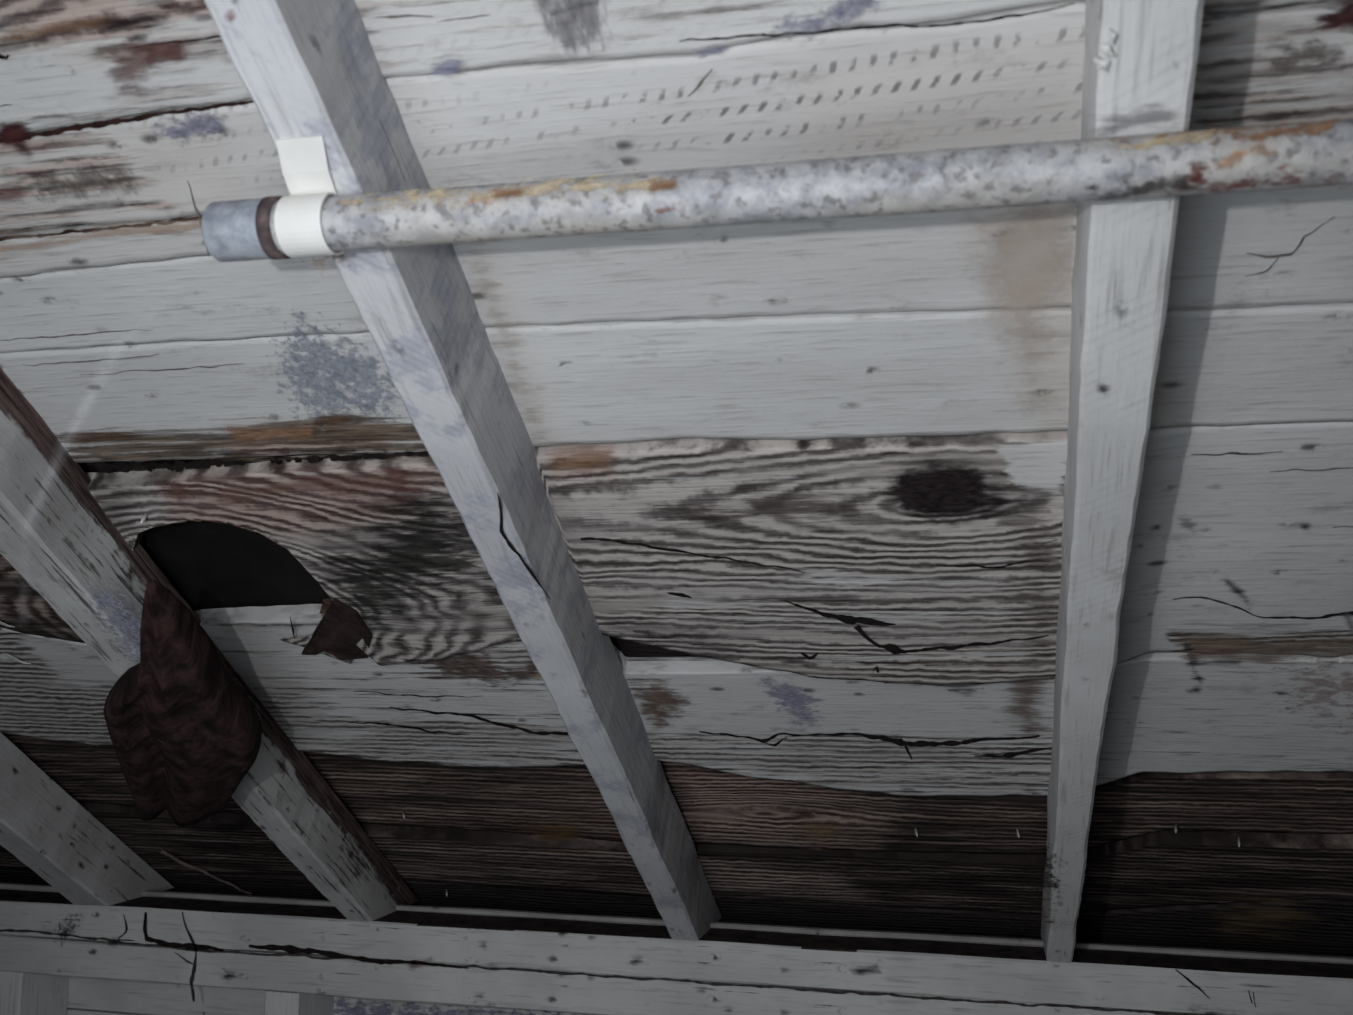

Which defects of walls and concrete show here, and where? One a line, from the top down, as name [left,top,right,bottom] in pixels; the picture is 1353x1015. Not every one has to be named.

crack [679,3,1074,97]
corrosion [1119,119,1339,150]
corrosion [340,169,676,210]
corrosion [1184,163,1300,192]
crack [497,493,550,599]
crack [580,537,1056,684]
crack [1173,596,1353,619]
crack [699,731,1052,760]
crack [0,912,1210,1015]